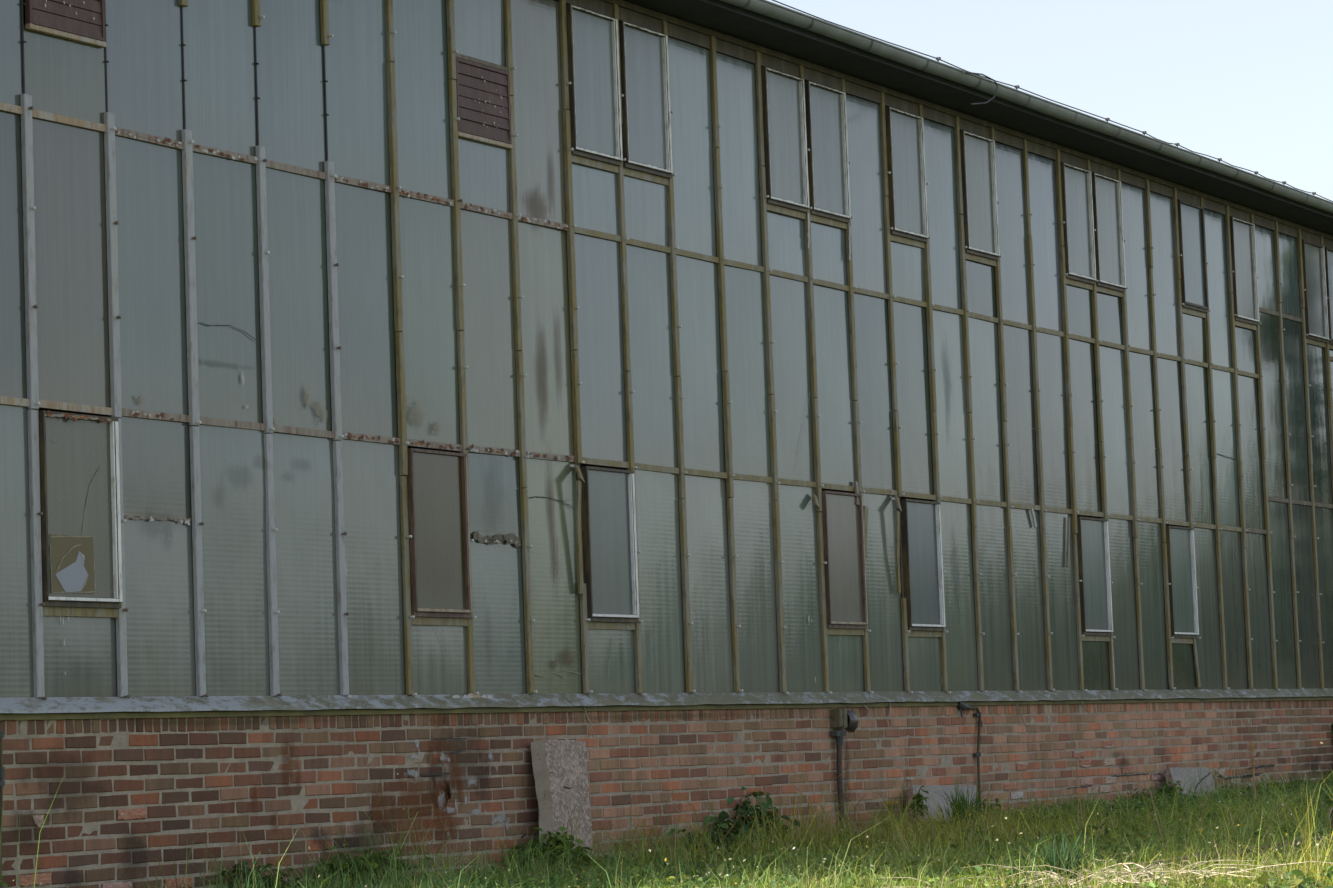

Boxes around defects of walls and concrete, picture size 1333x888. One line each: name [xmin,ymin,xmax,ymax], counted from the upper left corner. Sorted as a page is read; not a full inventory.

leakage [438,778,479,815]